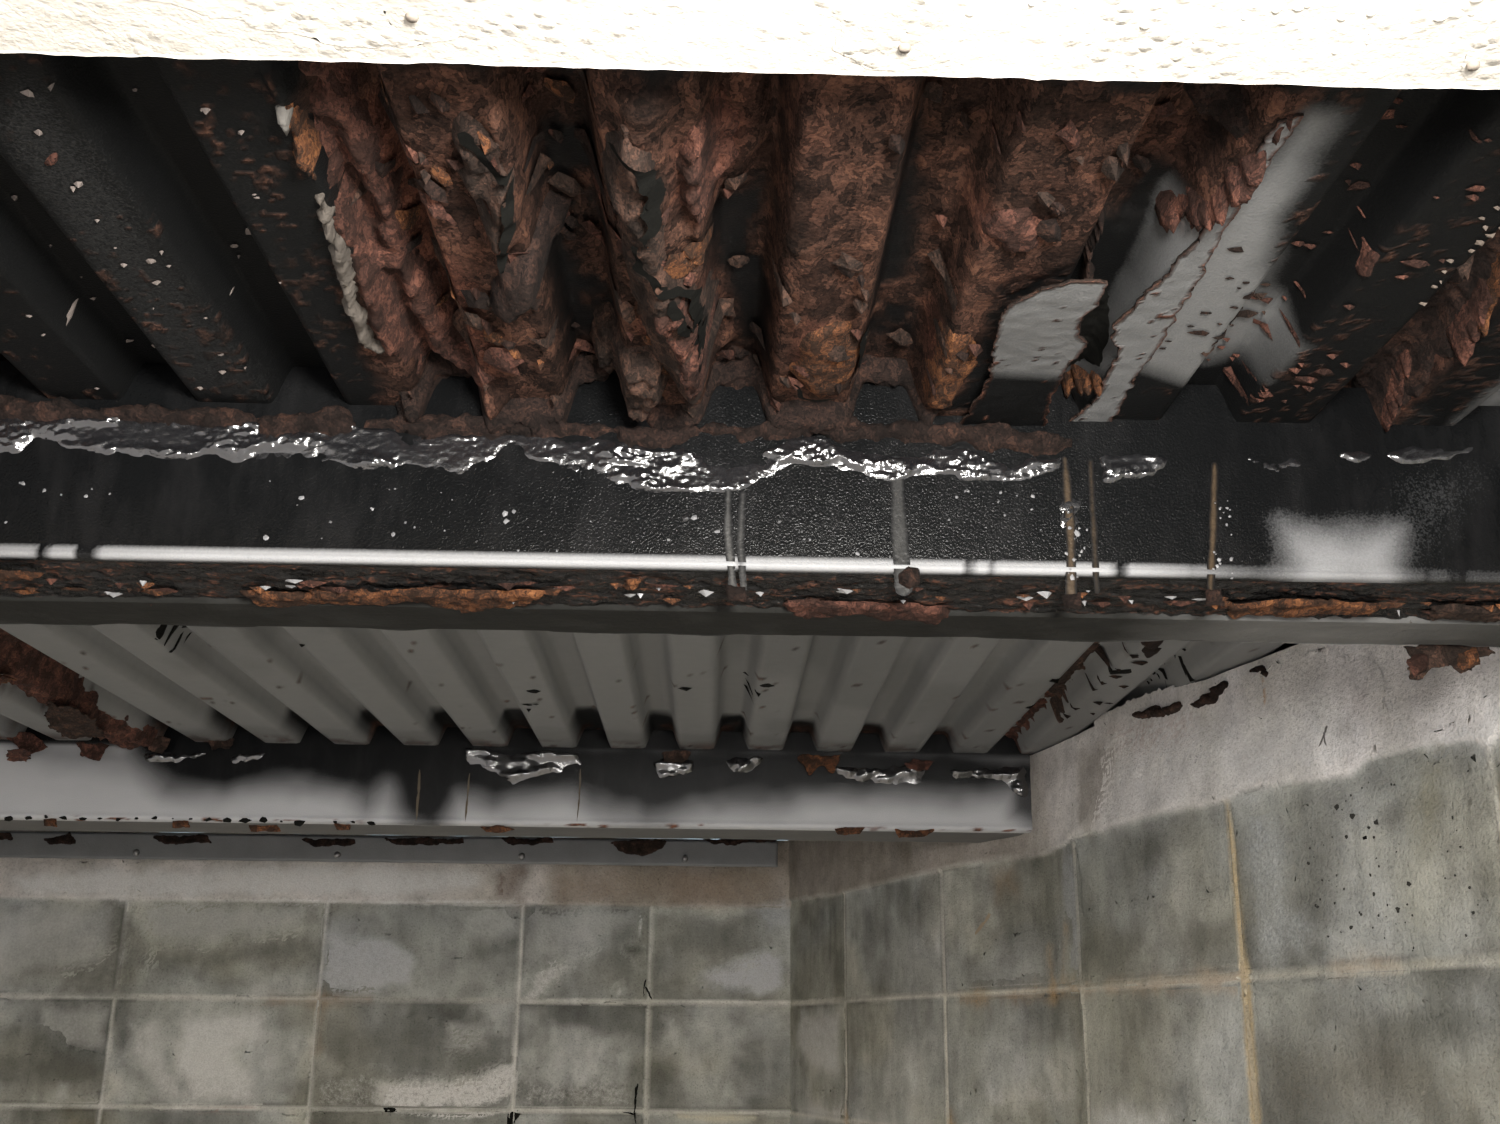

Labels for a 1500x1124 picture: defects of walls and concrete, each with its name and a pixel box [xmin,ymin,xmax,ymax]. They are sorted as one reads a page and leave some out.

peeling [1154,114,1294,233]
rust [0,66,810,449]
peeling [1446,253,1500,366]
peeling [1061,364,1104,398]
peeling [1380,349,1412,432]
damp [723,490,747,590]
damp [890,478,913,596]
damp [1061,456,1100,594]
rust [239,587,563,613]
rust [782,599,952,625]
rust [1224,598,1380,619]
rust [1094,680,1229,782]